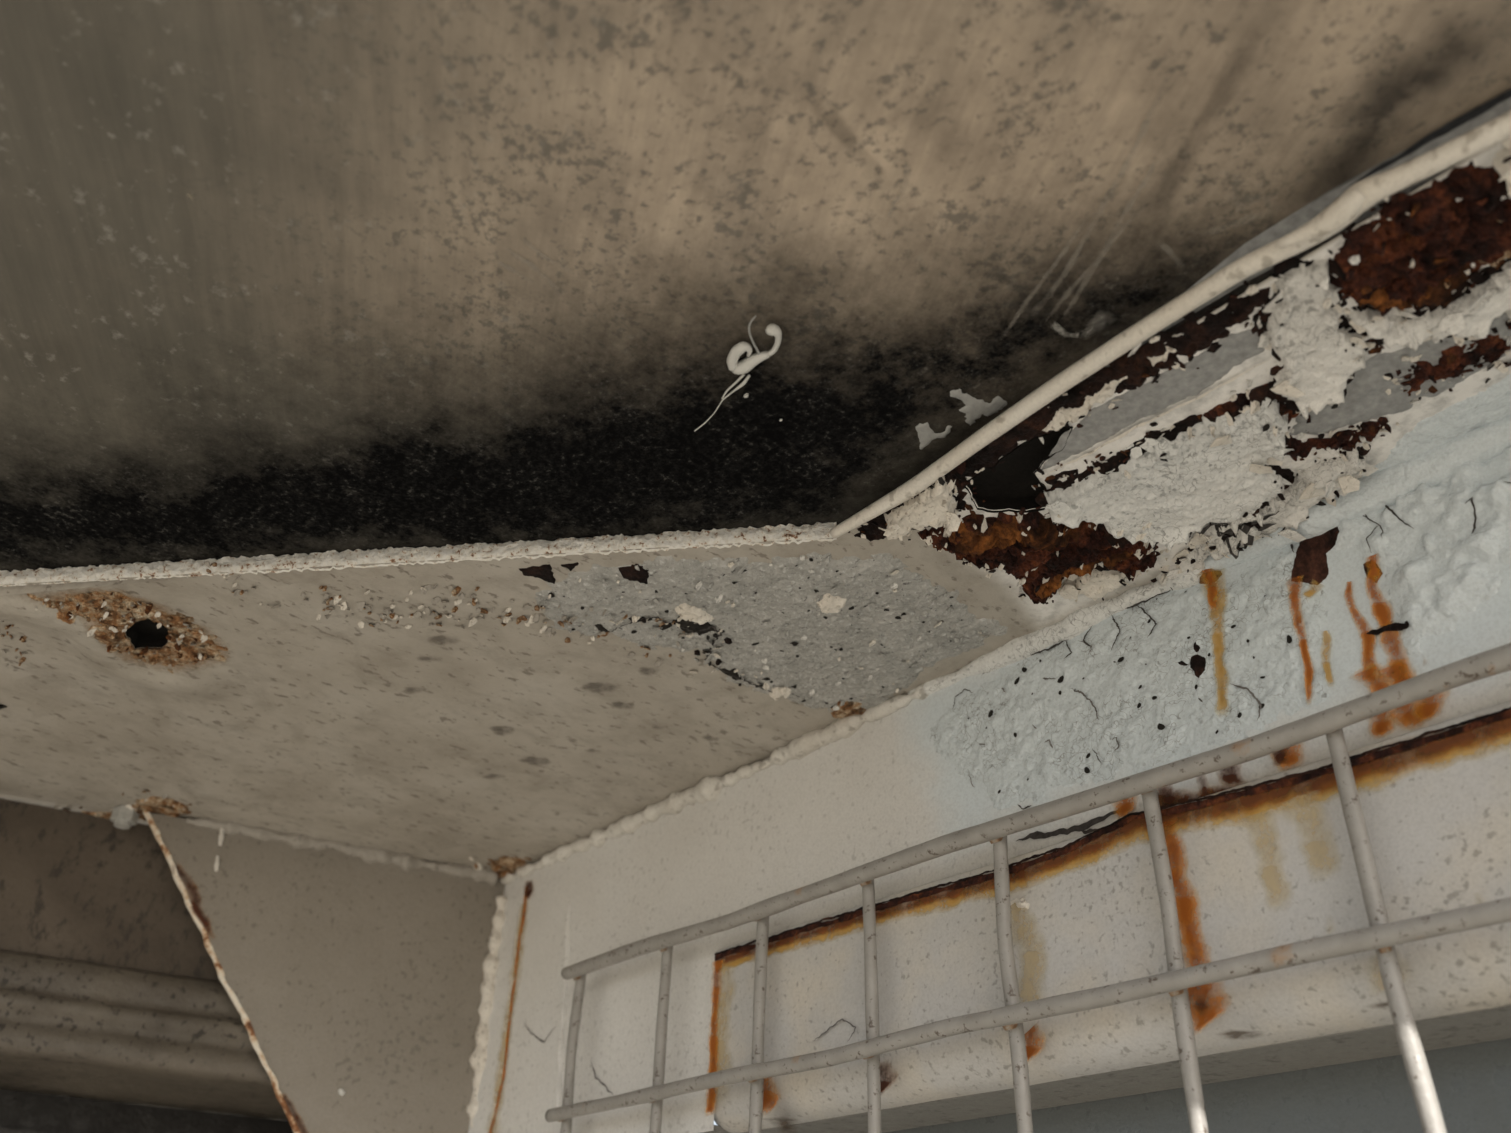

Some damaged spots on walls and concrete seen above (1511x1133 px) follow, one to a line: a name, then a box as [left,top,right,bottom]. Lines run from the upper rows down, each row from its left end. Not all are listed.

corrosion [1330,161,1511,354]
peeling [870,469,966,541]
corrosion [917,280,1400,604]
peeling [1035,250,1511,601]
corrosion [1383,319,1511,404]
corrosion [27,590,228,674]
spalling [0,522,841,681]
peeling [848,570,963,654]
peeling [1002,659,1098,719]
peeling [1232,676,1265,720]
corrosion [1289,527,1339,700]
corrosion [1345,554,1411,693]